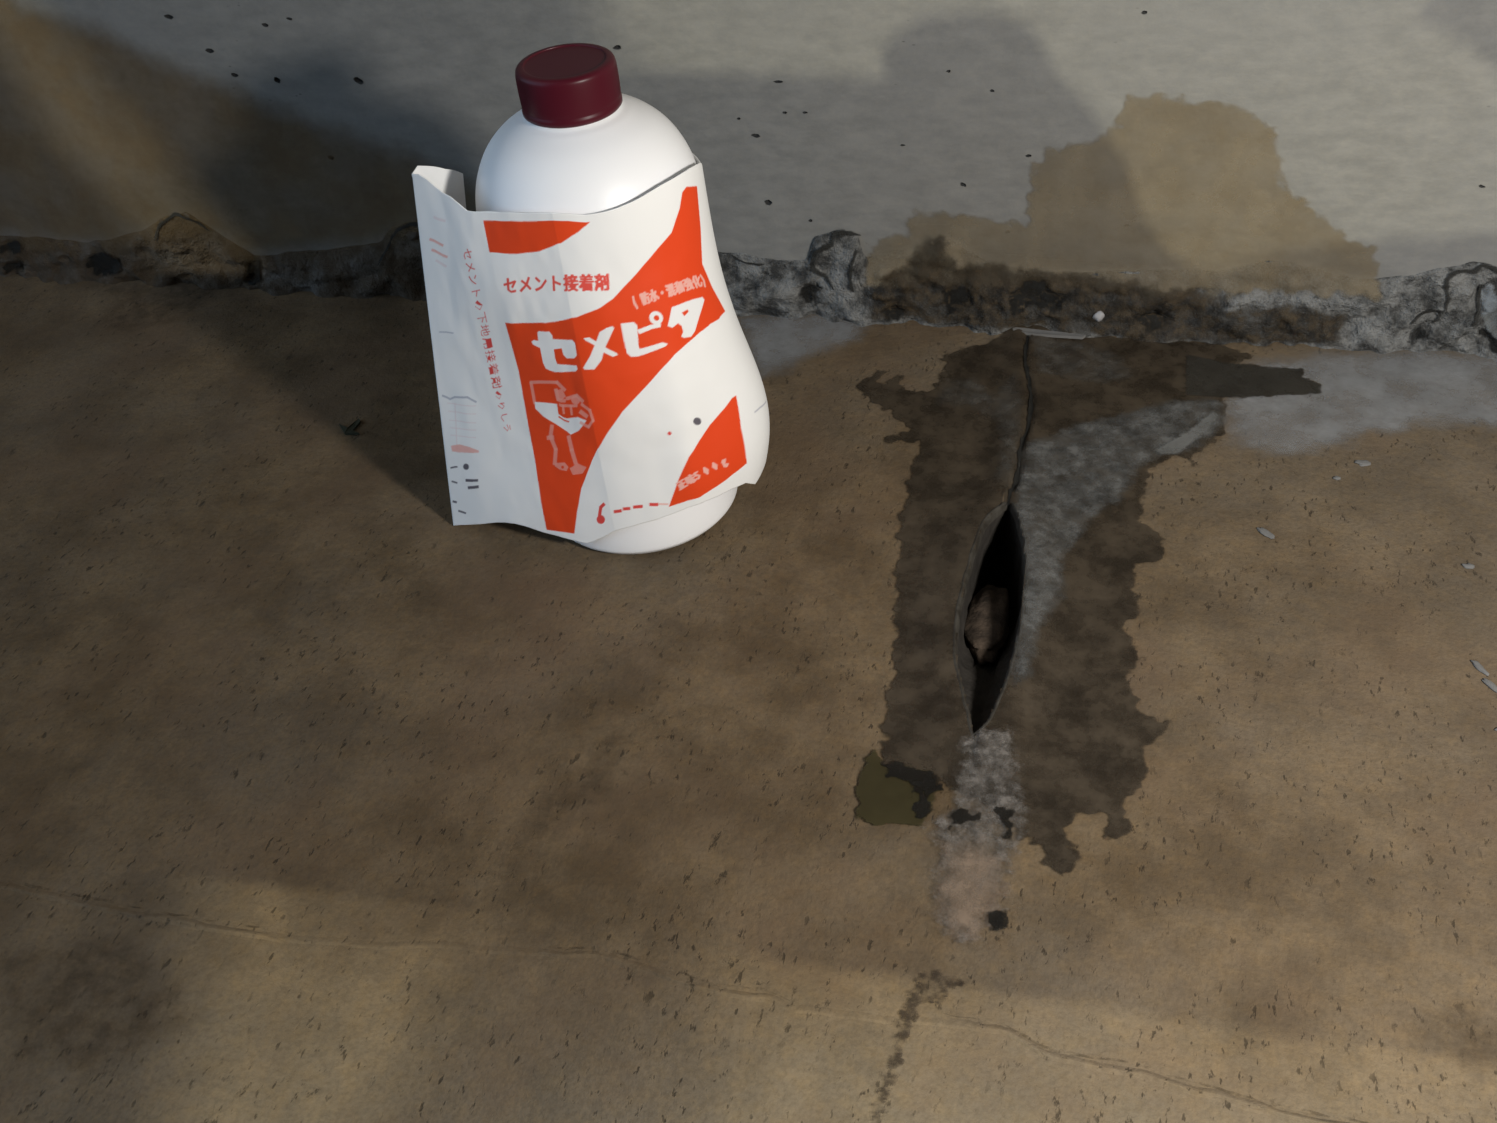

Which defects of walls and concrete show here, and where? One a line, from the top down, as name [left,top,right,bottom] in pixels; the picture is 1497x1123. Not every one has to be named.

peeling [1481,284,1497,339]
crack [953,335,1034,736]
water stain [856,94,1381,941]